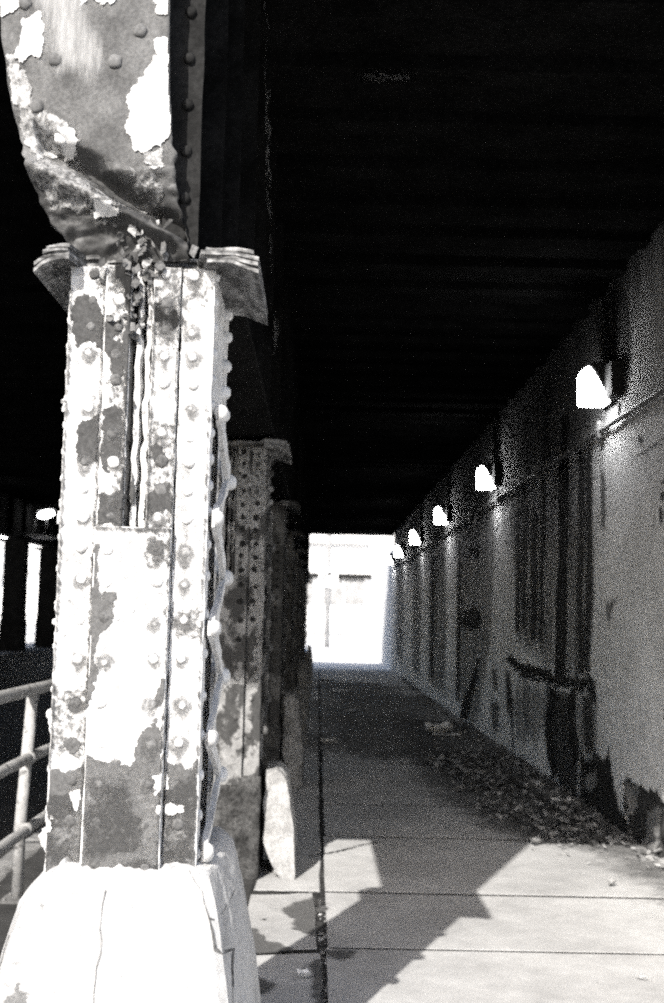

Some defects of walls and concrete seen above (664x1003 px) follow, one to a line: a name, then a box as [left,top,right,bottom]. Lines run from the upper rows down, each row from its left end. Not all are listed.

peeling [153,0,168,15]
peeling [0,0,79,162]
peeling [125,36,171,169]
peeling [69,293,125,377]
peeling [75,403,124,473]
peeling [97,491,130,527]
corrosion [34,144,213,800]
peeling [150,442,167,466]
peeling [142,482,186,520]
peeling [67,544,117,715]
leakage [322,278,662,877]
peeling [45,678,198,873]